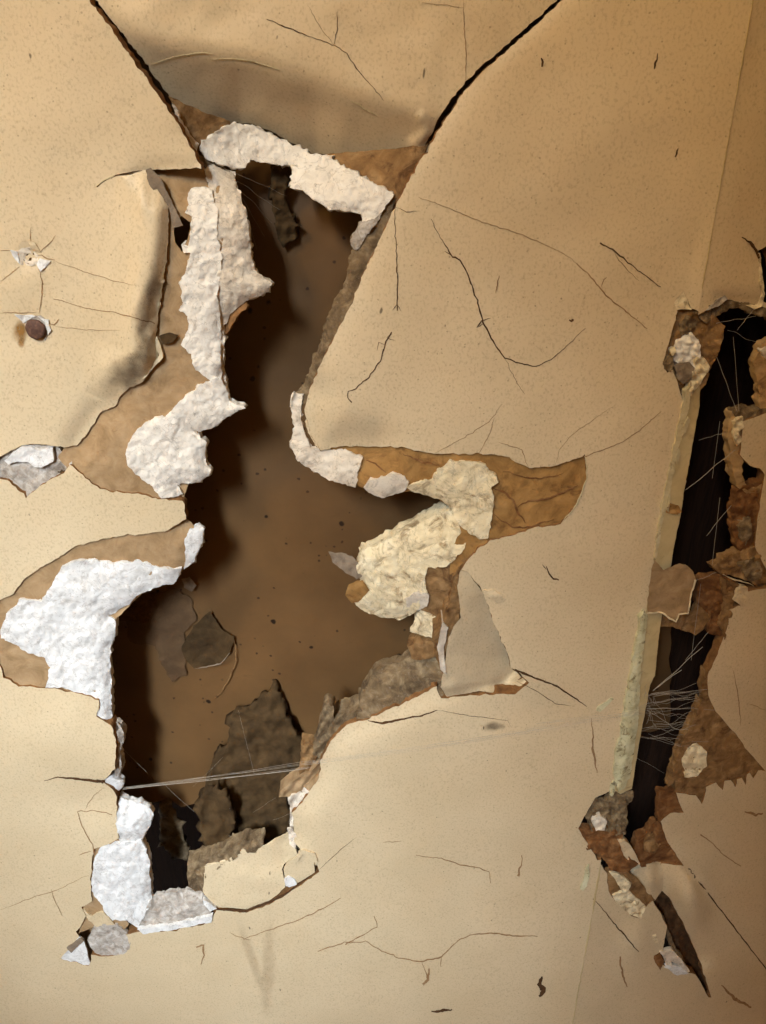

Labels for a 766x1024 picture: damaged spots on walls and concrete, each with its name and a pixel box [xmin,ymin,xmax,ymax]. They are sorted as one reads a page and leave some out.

crack [267,7,384,101]
crack [422,0,467,80]
corrosion [15,324,25,345]
crack [347,198,661,464]
flaking render [653,291,725,560]
spalling [0,37,588,965]
spalling [641,626,672,732]
crack [318,917,538,986]
flaking render [572,864,655,1024]
peeling [652,934,690,976]